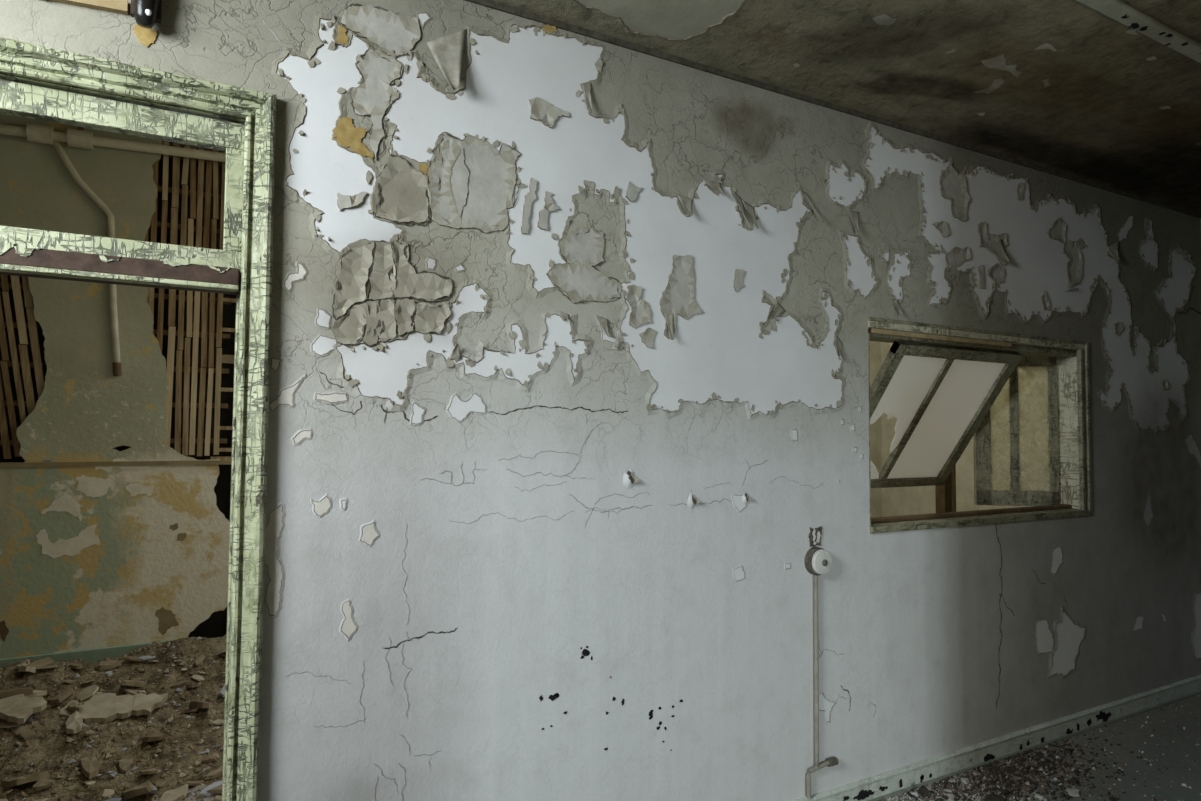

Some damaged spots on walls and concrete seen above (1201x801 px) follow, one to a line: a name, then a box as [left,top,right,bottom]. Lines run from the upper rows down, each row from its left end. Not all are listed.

peeling [269,0,1201,471]
peeling [36,458,155,558]
flaking render [169,523,187,542]
flaking render [0,621,9,641]
flaking render [155,607,179,635]
peeling [1035,606,1087,680]